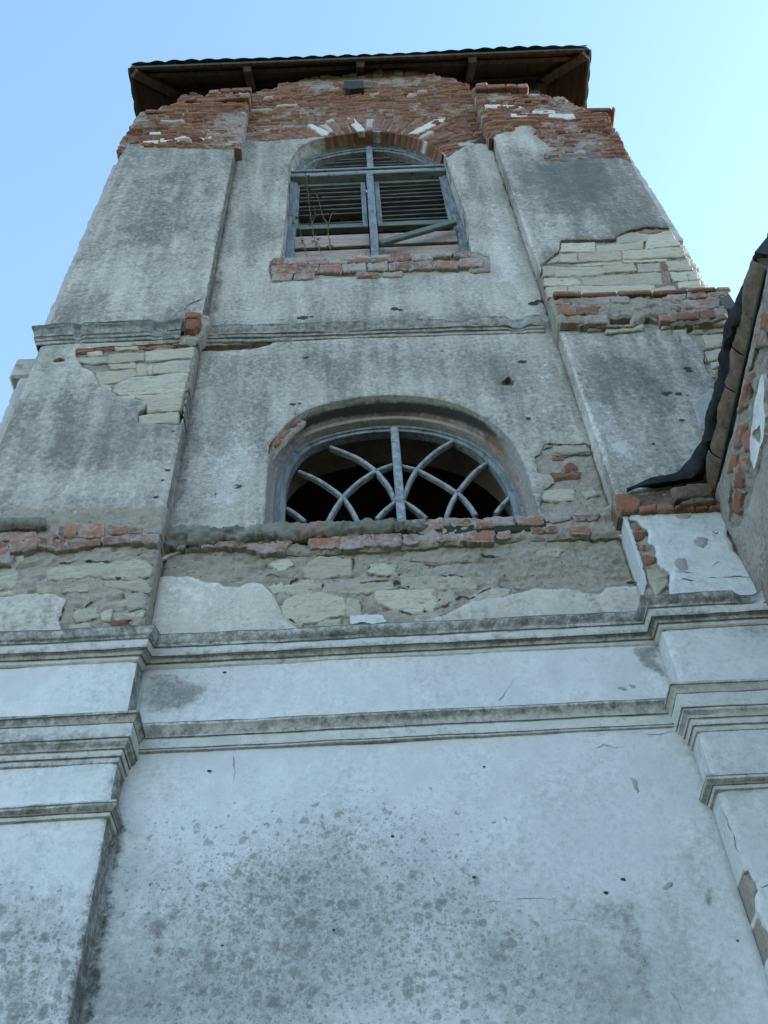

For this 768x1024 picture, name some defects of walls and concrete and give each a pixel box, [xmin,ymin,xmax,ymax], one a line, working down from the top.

flaking render [116,69,632,165]
flaking render [268,251,490,283]
flaking render [76,312,260,432]
flaking render [528,229,730,430]
flaking render [535,444,609,514]
flaking render [727,313,768,555]
flaking render [0,523,688,629]
peeling [693,537,708,548]